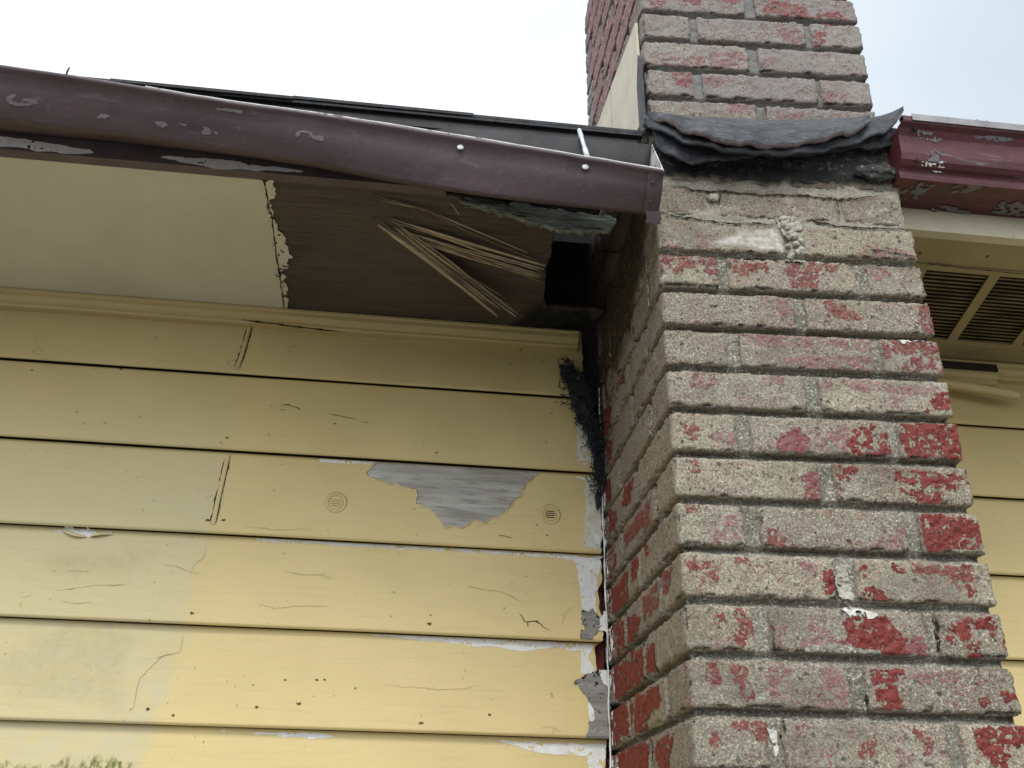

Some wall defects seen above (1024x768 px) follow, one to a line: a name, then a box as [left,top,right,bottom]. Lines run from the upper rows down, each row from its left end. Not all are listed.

peeling [0,136,93,154]
peeling [899,130,945,202]
peeling [161,156,303,309]
leakage [724,231,783,251]
peeling [741,216,963,481]
peeling [55,526,112,538]
peeling [256,366,674,768]
peeling [872,468,982,585]
crack [472,587,569,631]